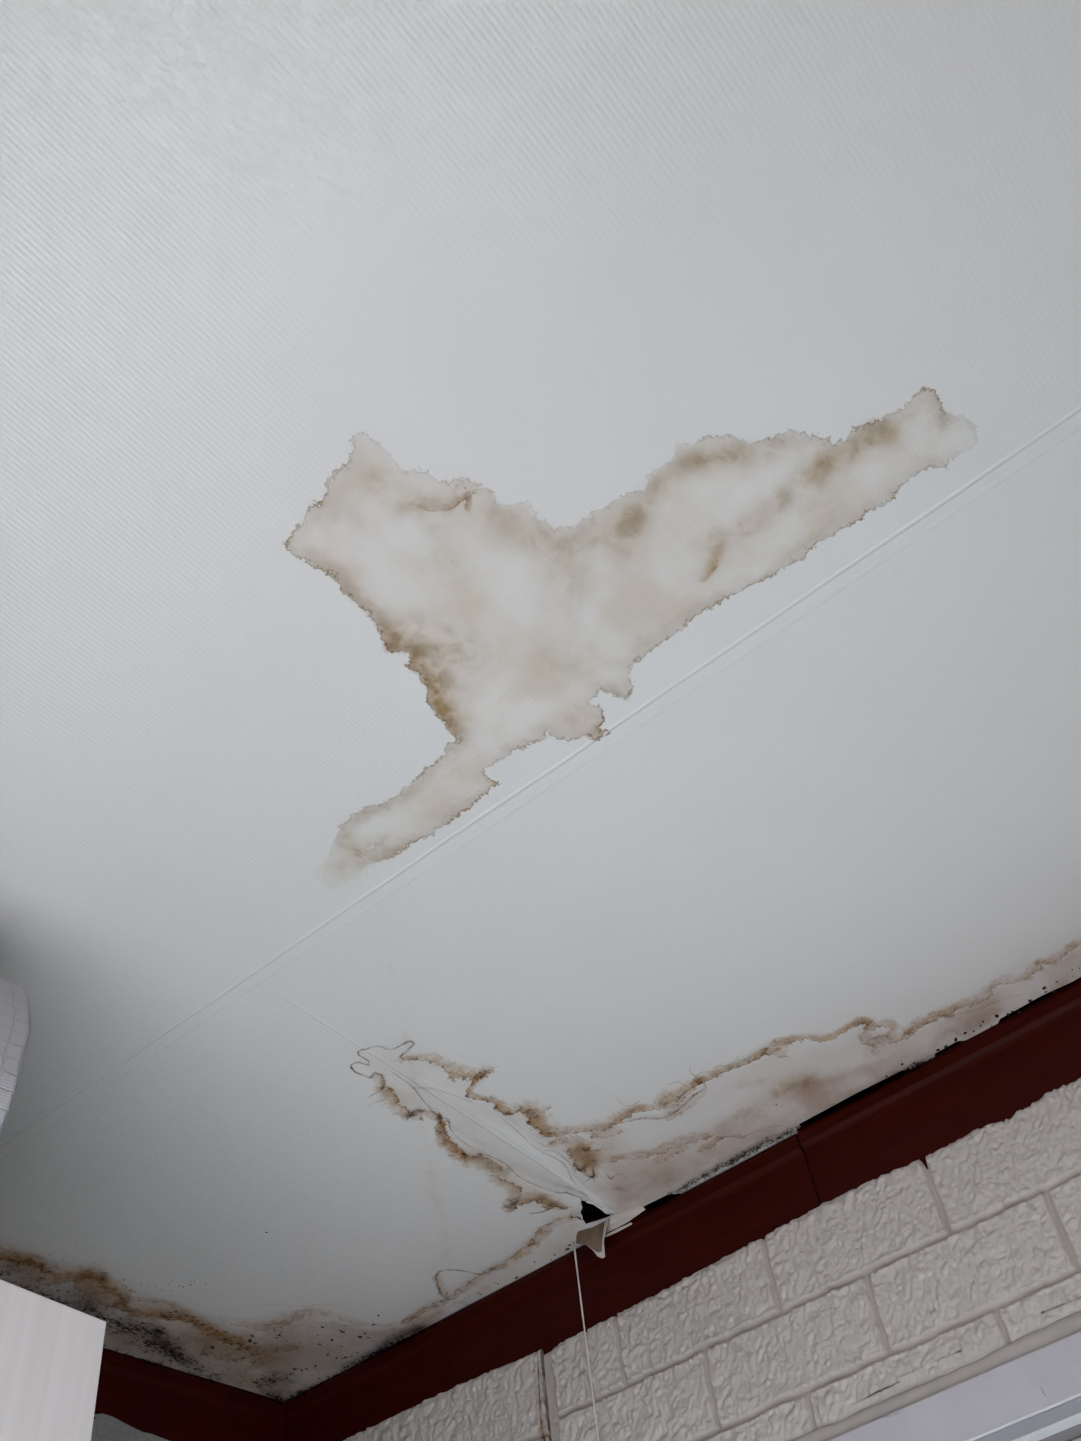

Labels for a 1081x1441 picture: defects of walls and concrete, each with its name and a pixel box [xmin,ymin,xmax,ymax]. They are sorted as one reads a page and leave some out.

leakage [351,1048,575,1305]
leakage [401,1054,661,1182]
leakage [653,968,1080,1206]
leakage [0,1257,455,1404]